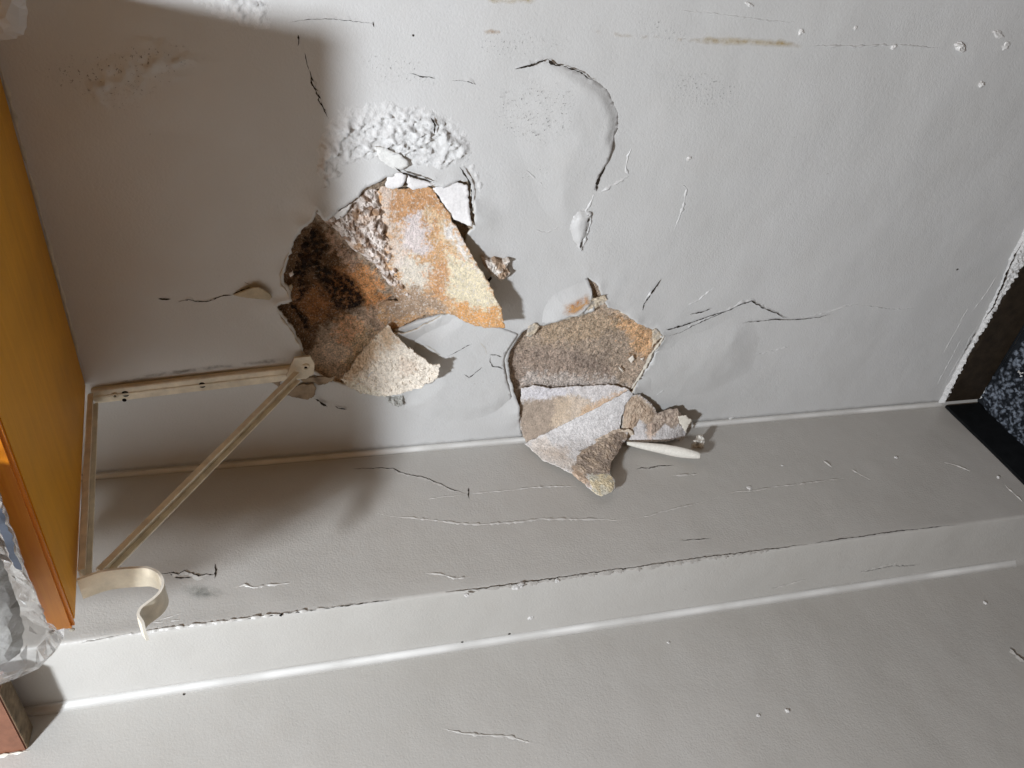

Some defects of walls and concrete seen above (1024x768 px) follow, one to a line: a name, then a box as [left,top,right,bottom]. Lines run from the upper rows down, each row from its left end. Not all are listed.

crack [290,14,374,117]
crack [516,58,592,80]
crack [159,282,272,302]
spalling [272,172,510,410]
crack [667,298,913,335]
spalling [508,278,705,496]
crack [356,467,571,499]
crack [164,566,217,581]
crack [446,524,958,593]